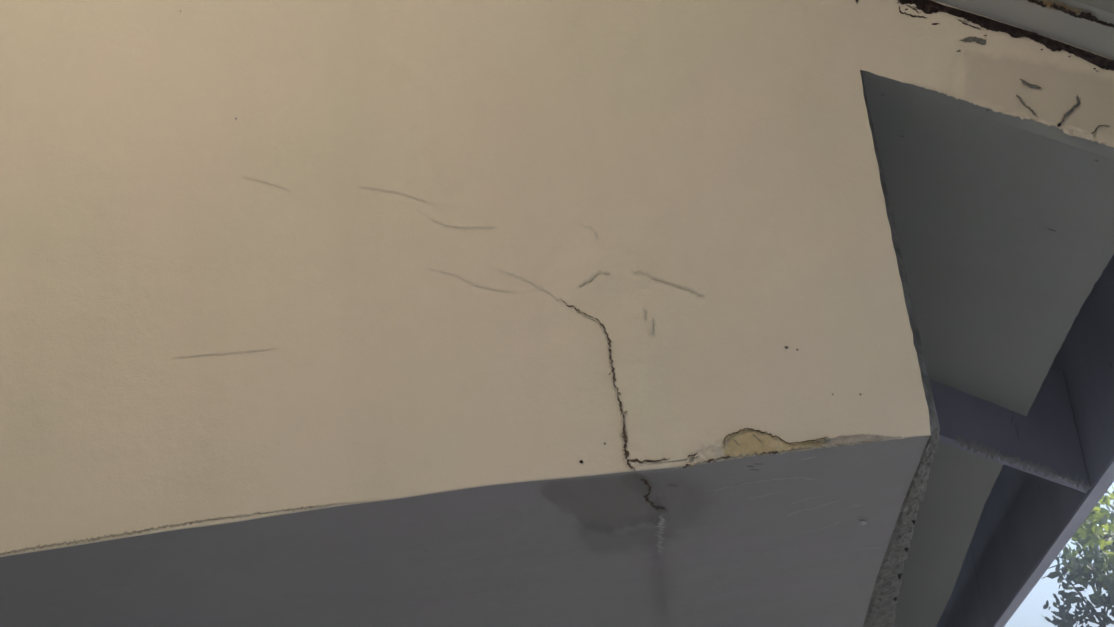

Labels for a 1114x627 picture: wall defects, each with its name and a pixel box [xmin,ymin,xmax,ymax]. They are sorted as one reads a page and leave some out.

peeling [957,17,987,45]
crack [1028,0,1114,28]
crack [425,268,705,627]
flaking render [669,428,904,470]